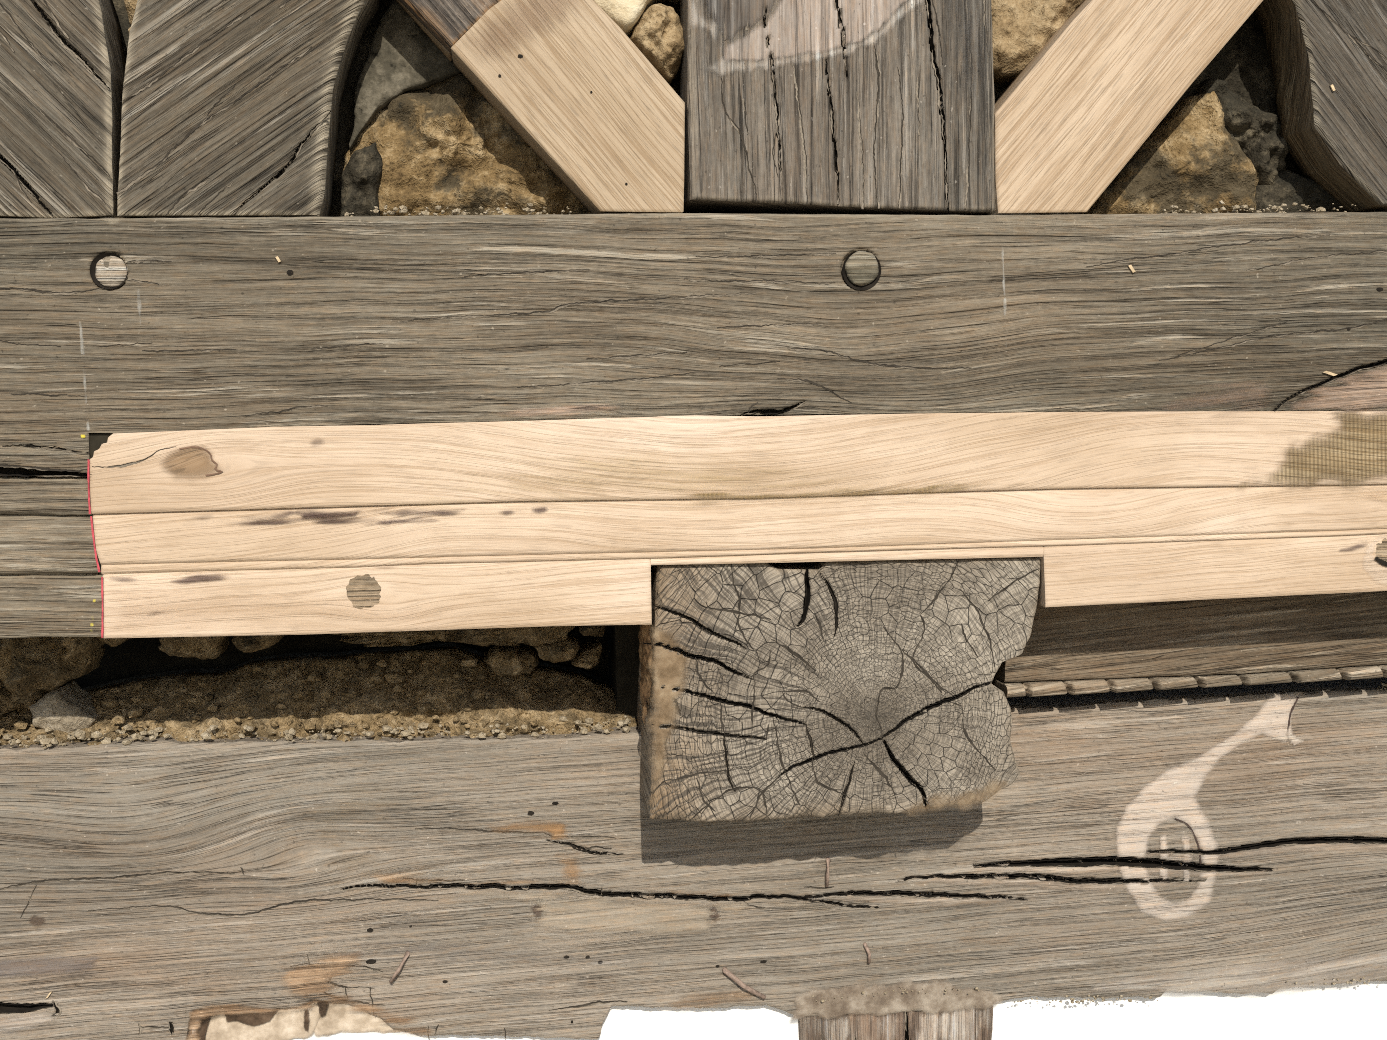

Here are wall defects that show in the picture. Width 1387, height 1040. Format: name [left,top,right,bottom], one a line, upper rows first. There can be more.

crack [1159,318,1387,361]
crack [1273,360,1387,411]
crack [0,444,176,477]
water stain [1274,413,1387,485]
crack [642,560,1040,823]
crack [415,827,623,857]
crack [0,836,1387,918]